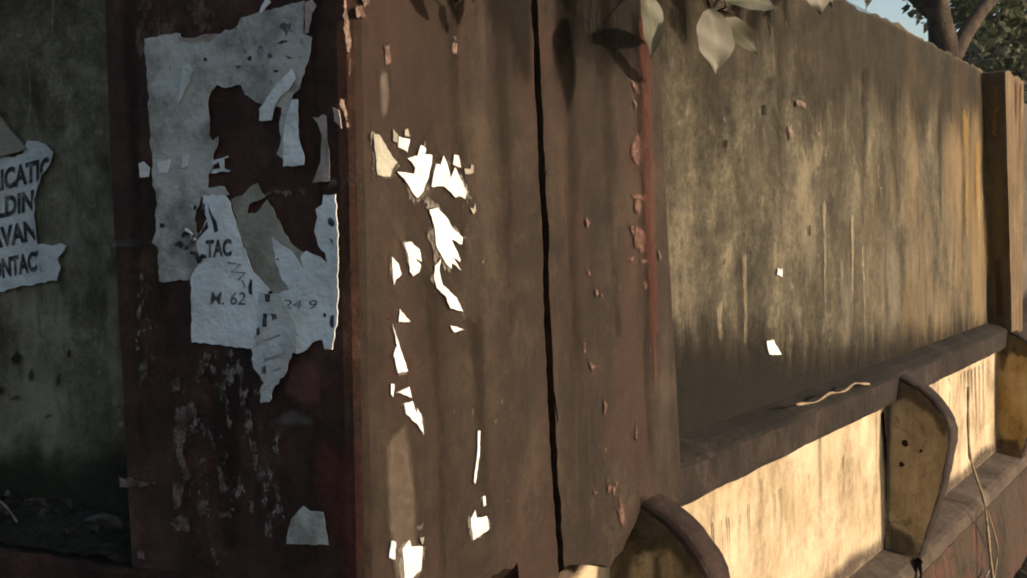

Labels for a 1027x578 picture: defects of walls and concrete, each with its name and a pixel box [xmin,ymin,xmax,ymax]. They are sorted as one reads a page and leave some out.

crack [530,0,564,573]
crack [914,557,923,578]